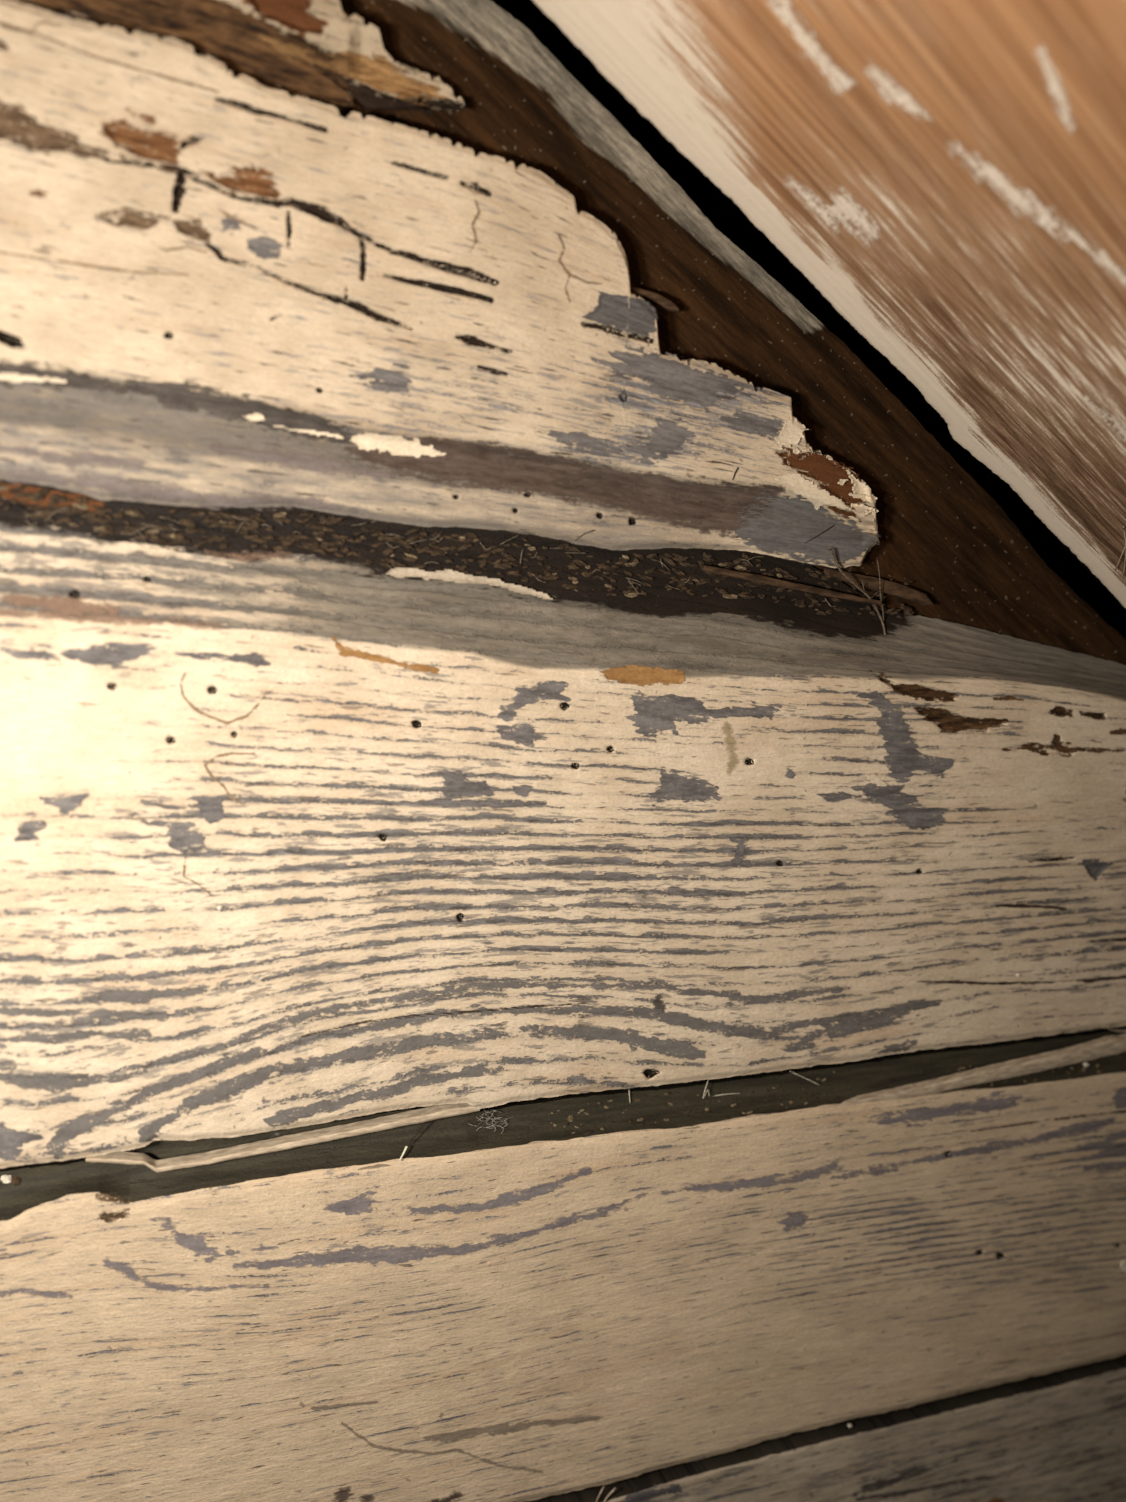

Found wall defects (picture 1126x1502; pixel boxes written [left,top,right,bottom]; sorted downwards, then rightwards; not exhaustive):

peeling [97,207,282,260]
peeling [349,363,412,393]
peeling [547,291,808,465]
peeling [734,470,881,571]
peeling [386,567,553,600]
peeling [496,681,571,747]
peeling [600,665,782,737]
peeling [419,770,547,810]
peeling [648,767,722,806]
peeling [817,691,954,830]
peeling [729,837,750,864]
peeling [1082,859,1113,881]